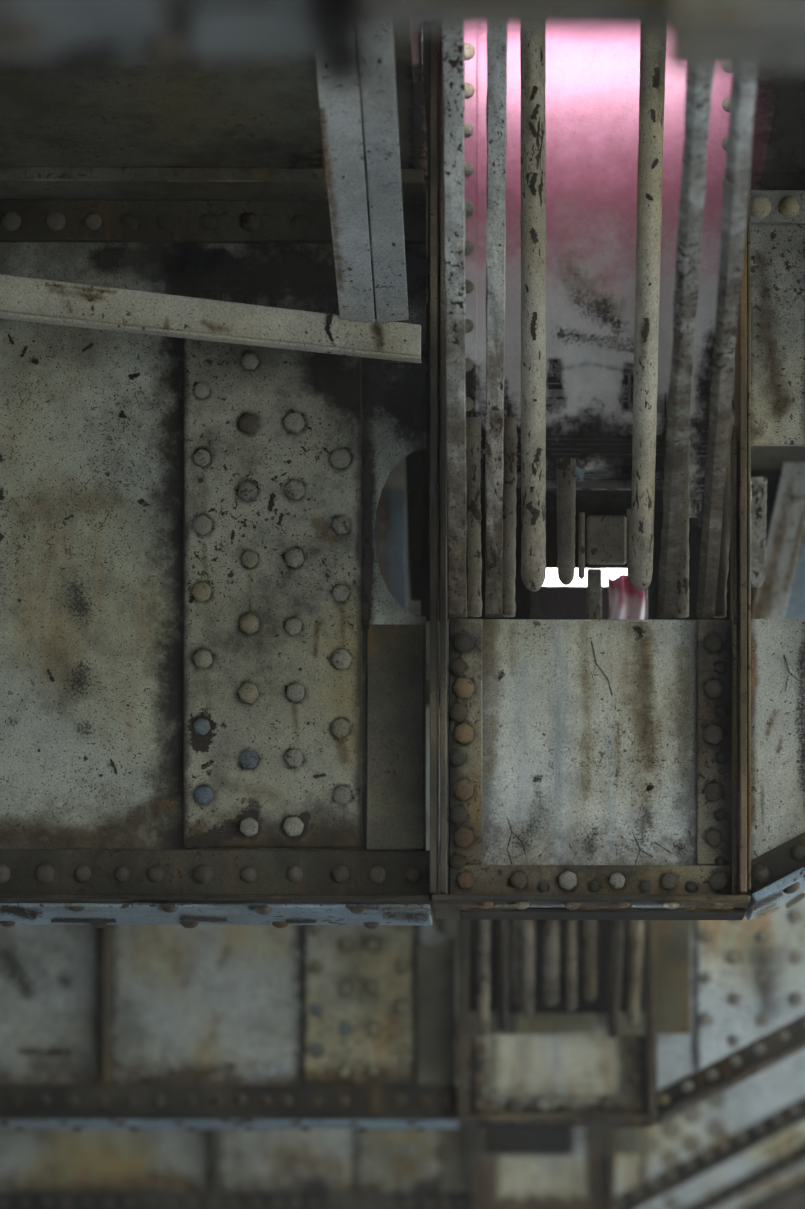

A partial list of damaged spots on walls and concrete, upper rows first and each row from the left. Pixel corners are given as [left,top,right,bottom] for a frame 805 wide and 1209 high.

crack [590,638,613,695]
rust [616,622,657,768]
crack [506,817,547,864]
crack [632,832,670,864]
peeling [0,898,432,924]
peeling [751,891,805,915]